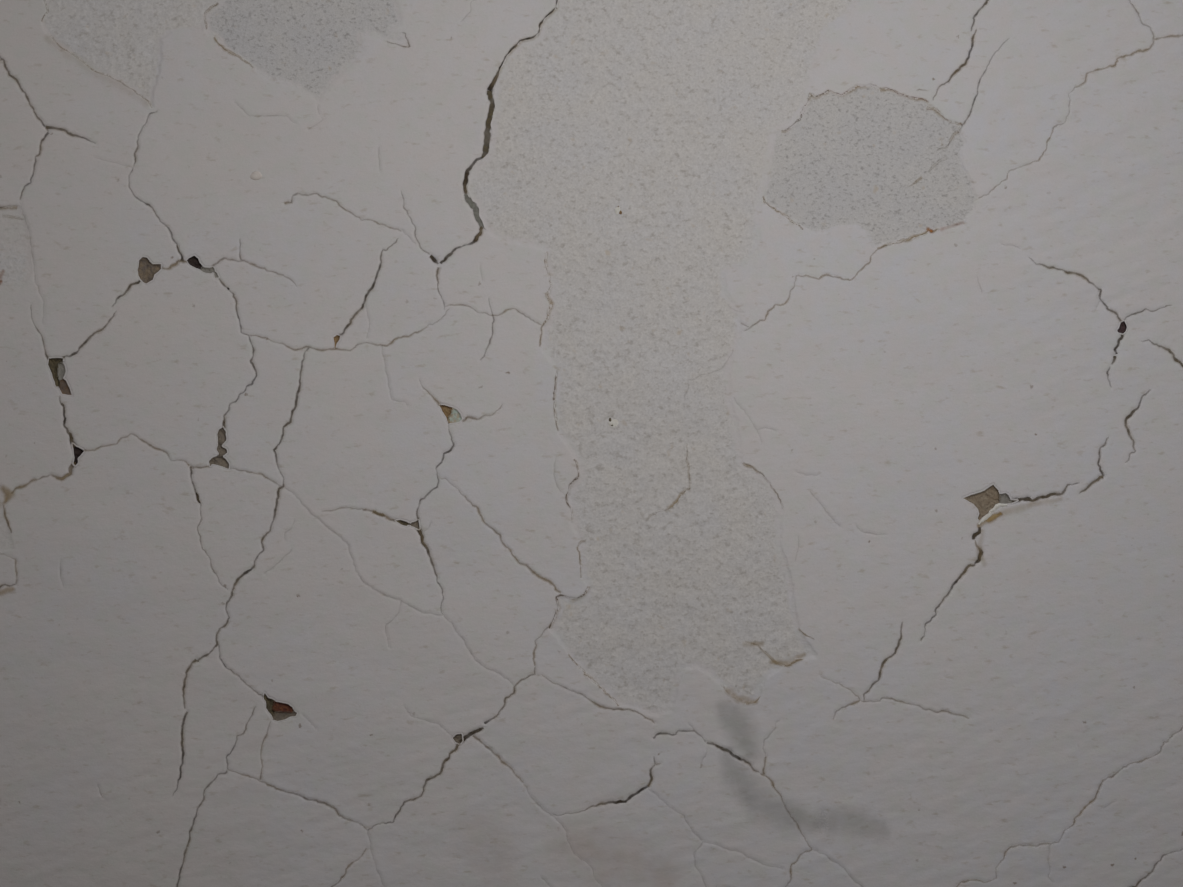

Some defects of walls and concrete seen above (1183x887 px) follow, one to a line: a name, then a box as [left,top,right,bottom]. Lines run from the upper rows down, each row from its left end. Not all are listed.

crack [951,0,988,77]
crack [430,1,558,268]
spalling [48,358,71,395]
crack [57,403,76,480]
peeling [439,405,453,423]
peeling [467,0,977,716]
flaking render [963,485,1017,525]
crack [1012,452,1104,502]
crack [938,527,983,607]
peeling [264,694,297,721]
crack [395,721,488,817]
crack [598,772,653,805]